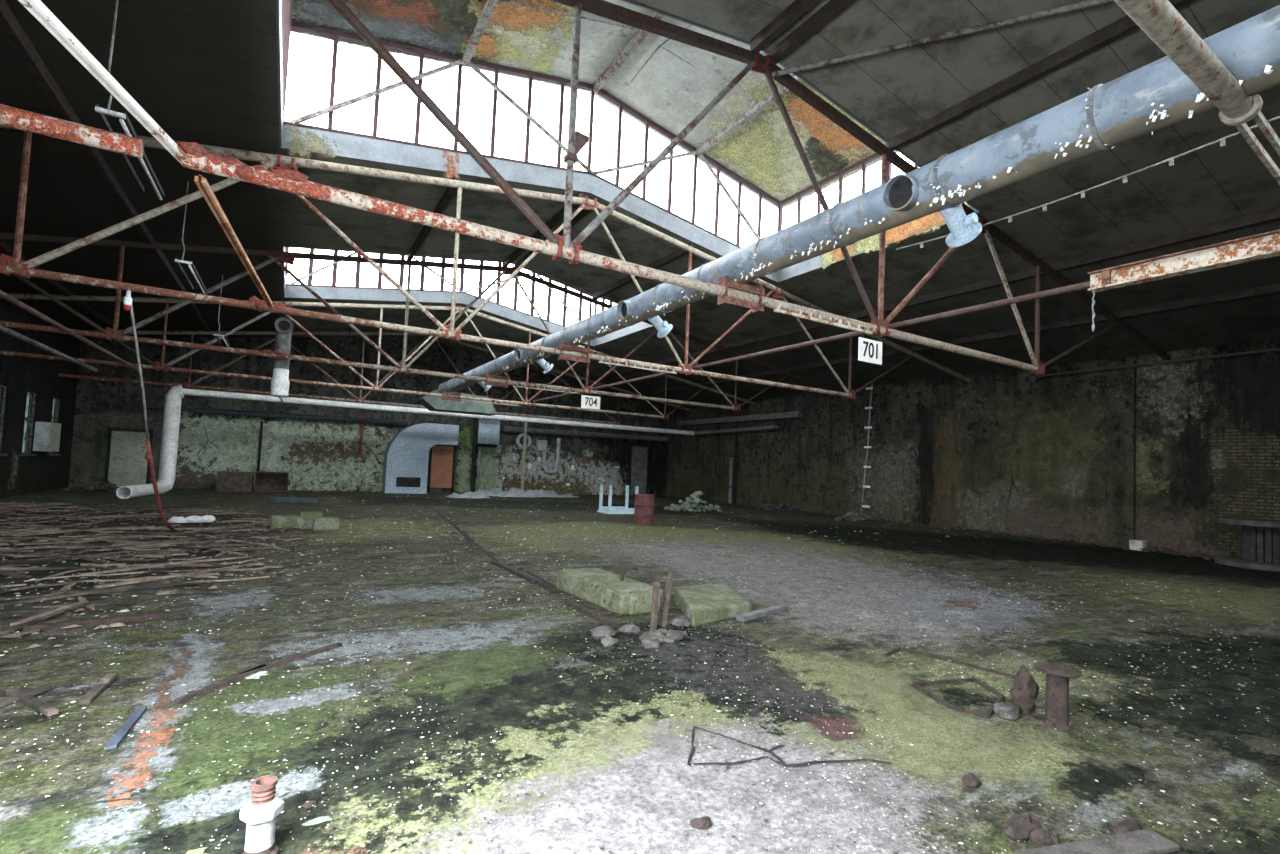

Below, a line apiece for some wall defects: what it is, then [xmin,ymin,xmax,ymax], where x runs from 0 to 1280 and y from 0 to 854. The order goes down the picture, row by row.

leakage [291,0,570,66]
rust [443,151,459,178]
leakage [707,81,880,193]
peeling [172,409,396,492]
peeling [474,444,627,495]
leakage [750,403,1280,581]
rust [107,649,196,807]
leakage [0,622,1147,854]